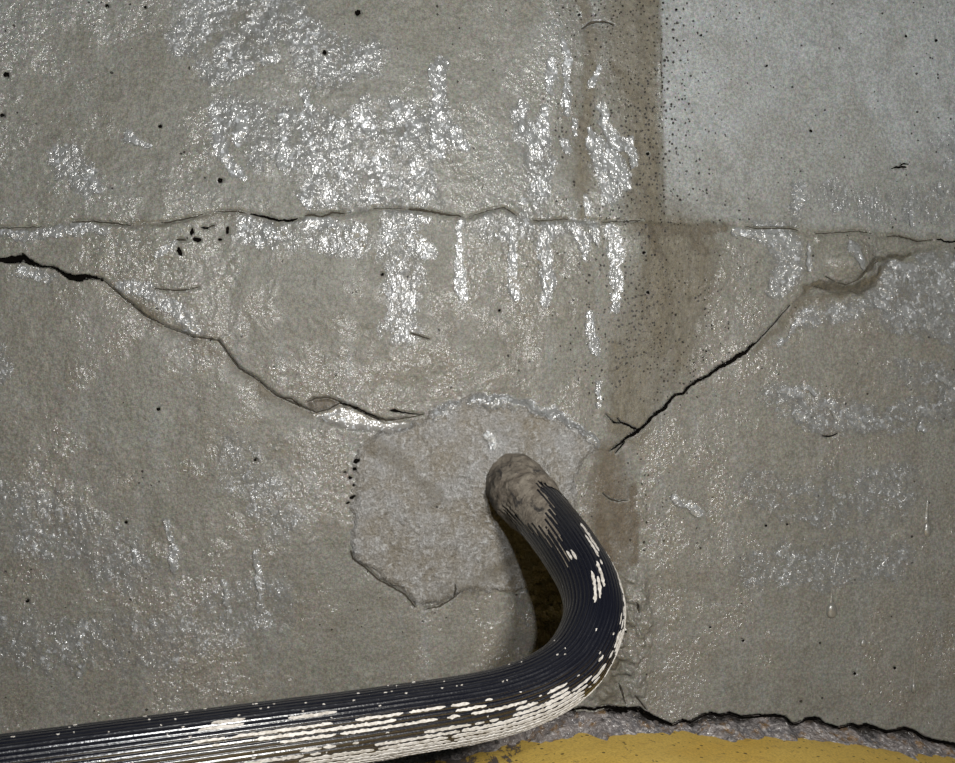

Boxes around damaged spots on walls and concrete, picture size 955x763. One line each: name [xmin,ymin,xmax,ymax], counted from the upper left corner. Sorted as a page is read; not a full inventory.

leakage [166,0,471,345]
crack [76,219,131,227]
crack [161,210,344,223]
crack [374,207,564,221]
crack [746,226,955,243]
crack [0,255,423,421]
crack [606,305,790,453]
crack [567,684,955,745]